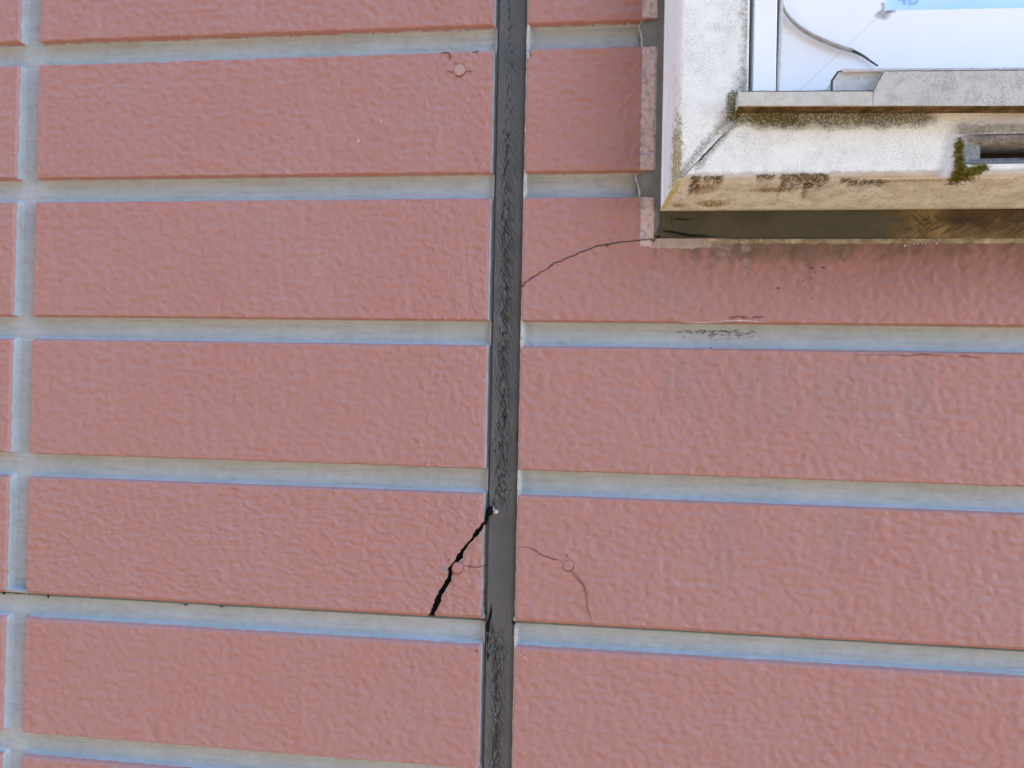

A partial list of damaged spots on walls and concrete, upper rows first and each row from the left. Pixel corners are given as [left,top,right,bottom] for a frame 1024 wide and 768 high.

damp [722,70,934,129]
damp [941,114,1024,177]
damp [757,173,828,189]
crack [429,1,716,621]